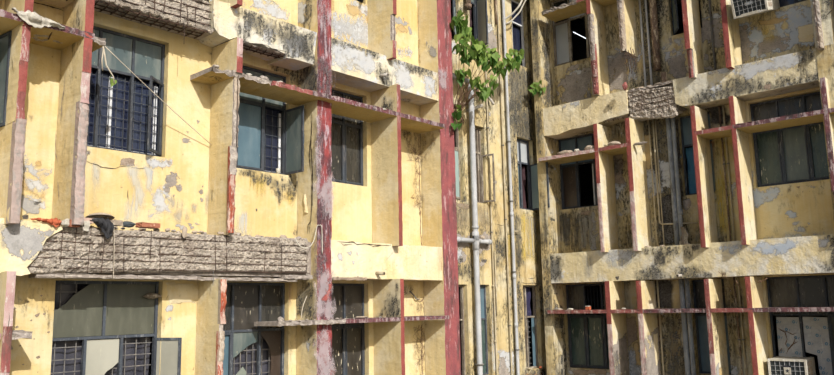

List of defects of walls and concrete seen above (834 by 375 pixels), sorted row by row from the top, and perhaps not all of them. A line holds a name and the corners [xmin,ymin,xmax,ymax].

spalling [94,0,215,39]
spalling [243,29,306,59]
water stain [238,0,335,90]
peeling [319,1,375,74]
peeling [390,13,437,89]
water stain [508,0,552,166]
flaking render [556,14,599,108]
spalling [603,0,694,123]
peeling [701,0,824,79]
spalling [1,75,367,375]
water stain [494,177,593,375]
water stain [636,118,712,375]